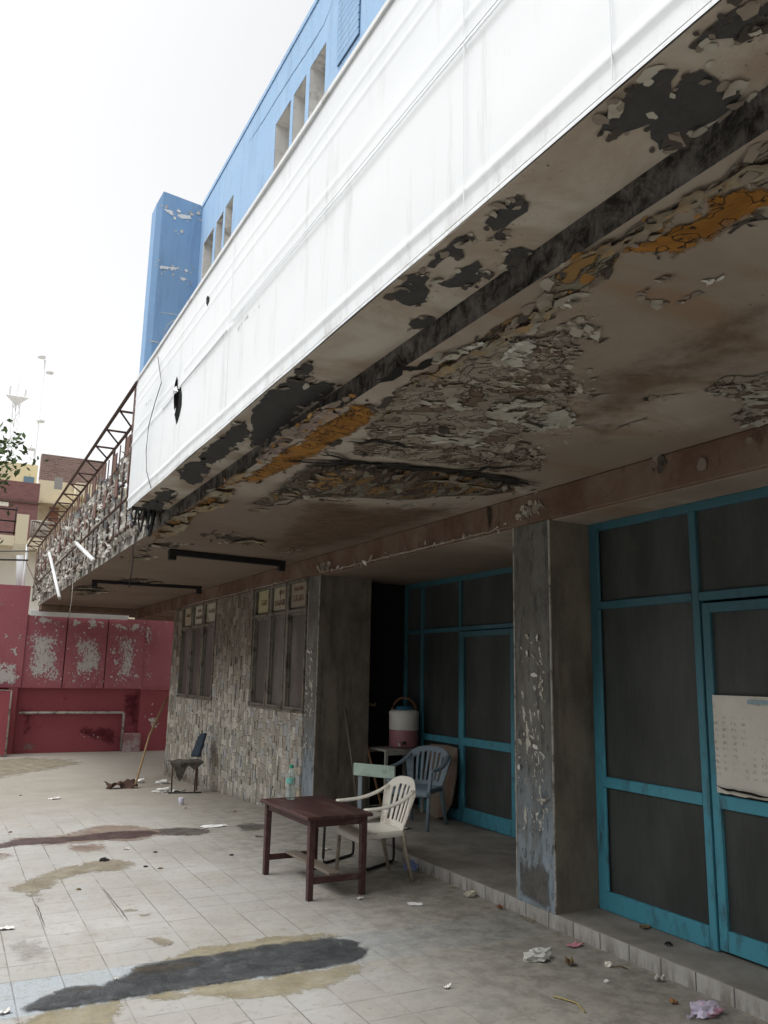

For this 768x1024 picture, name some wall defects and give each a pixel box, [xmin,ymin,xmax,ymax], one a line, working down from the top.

peeling [592,0,768,154]
peeling [161,205,202,235]
rust [623,177,768,260]
peeling [346,141,768,473]
peeling [141,361,356,511]
peeling [0,616,153,688]
peeling [517,634,548,832]
water stain [0,825,209,848]
water stain [17,933,372,1024]